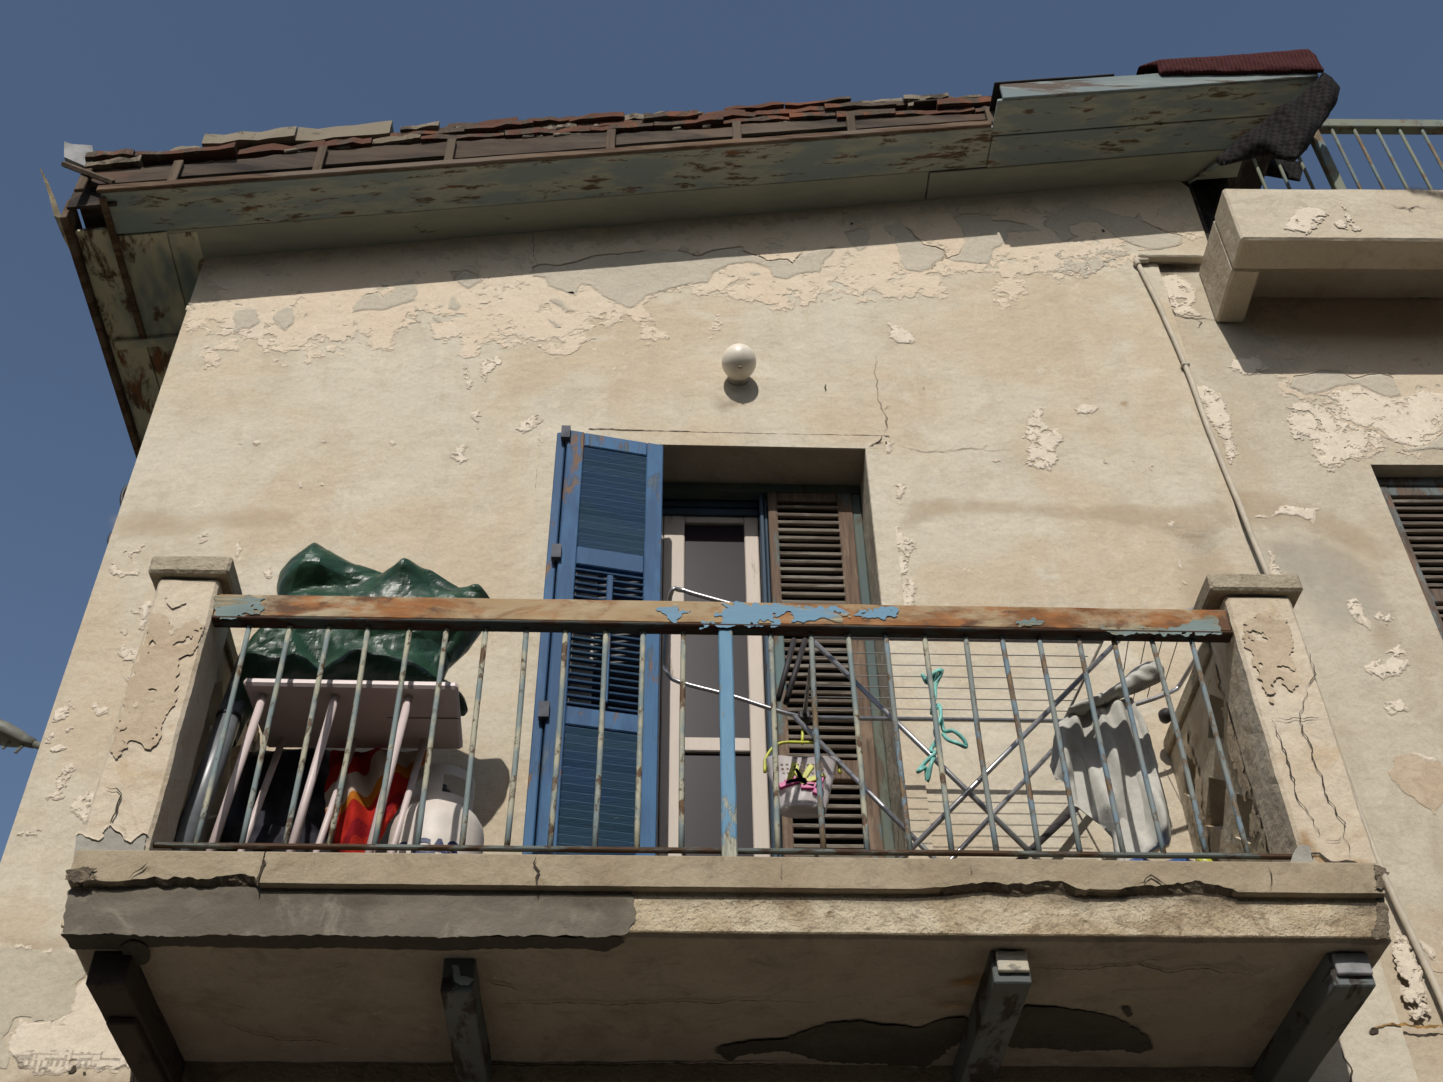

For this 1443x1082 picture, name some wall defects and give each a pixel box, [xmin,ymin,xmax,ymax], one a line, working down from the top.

water stain [1410,188,1443,197]
peeling [183,187,1203,389]
peeling [1022,407,1064,471]
peeling [1197,384,1238,464]
peeling [1229,298,1443,472]
flaking render [91,590,205,758]
flaking render [1242,613,1299,703]
crack [106,787,124,829]
peeling [1371,865,1443,1020]